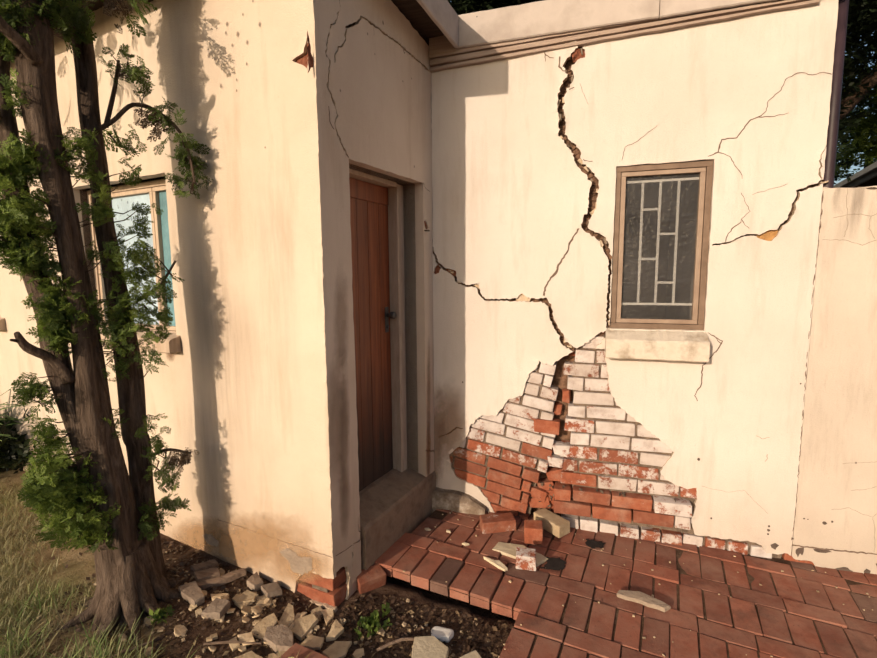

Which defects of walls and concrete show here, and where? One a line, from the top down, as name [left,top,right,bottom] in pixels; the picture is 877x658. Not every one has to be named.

flaking render [295,31,314,72]
crack [424,46,613,354]
crack [709,72,877,555]
flaking render [450,336,831,565]
damp [182,525,282,563]
flaking render [210,590,278,646]
flaking render [279,548,352,658]
flaking render [484,557,508,572]